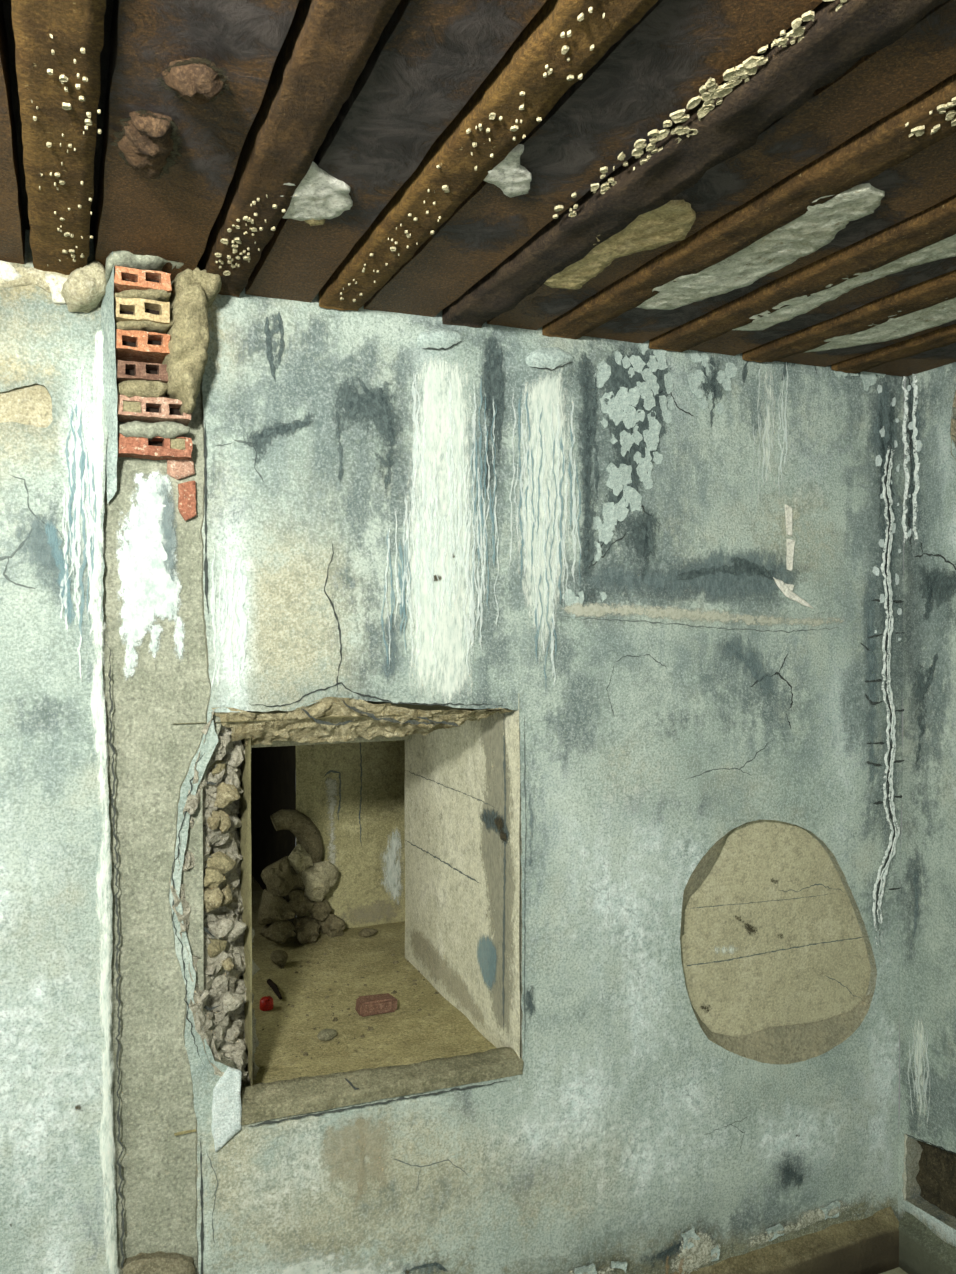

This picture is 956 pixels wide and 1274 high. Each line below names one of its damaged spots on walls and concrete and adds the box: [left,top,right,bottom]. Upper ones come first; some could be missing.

rust [110,109,183,179]
rust [156,57,230,105]
crack [0,475,69,589]
leakage [264,312,285,379]
leakage [335,379,397,492]
leakage [381,337,795,699]
peeling [593,340,738,562]
leakage [864,382,924,781]
spalling [88,331,197,1274]
spalling [169,697,519,1084]
crack [249,544,527,1046]
spalling [680,820,874,1065]